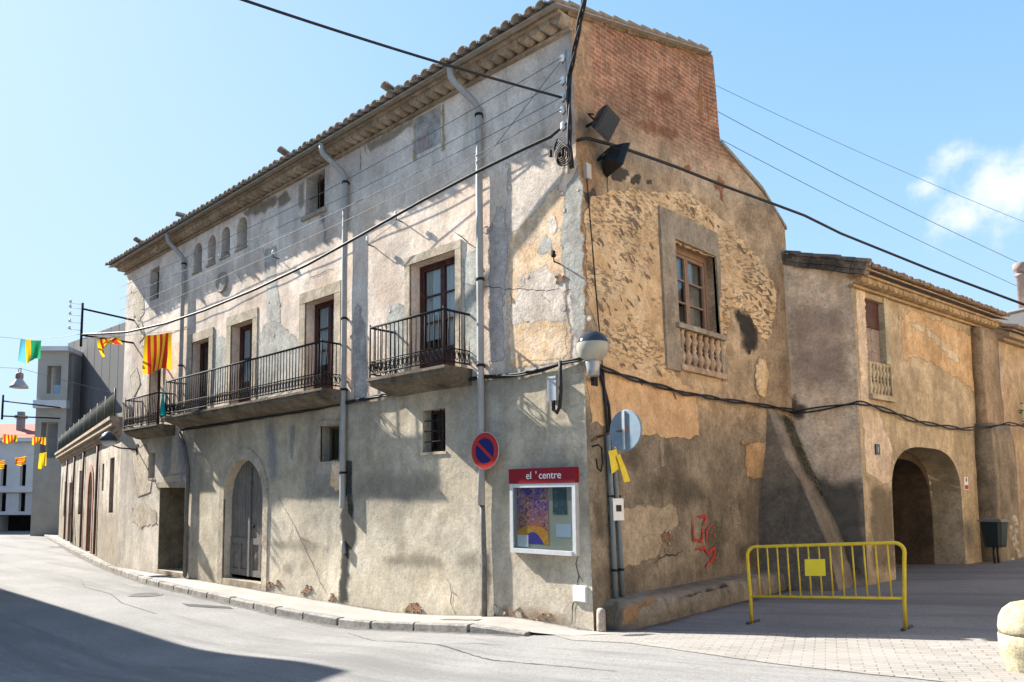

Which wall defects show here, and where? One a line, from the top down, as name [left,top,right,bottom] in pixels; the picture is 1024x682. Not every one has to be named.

crack [464,283,571,303]
flaking render [462,146,777,440]
water stain [735,309,758,354]
flaking render [740,439,766,480]
flaking render [608,502,680,569]